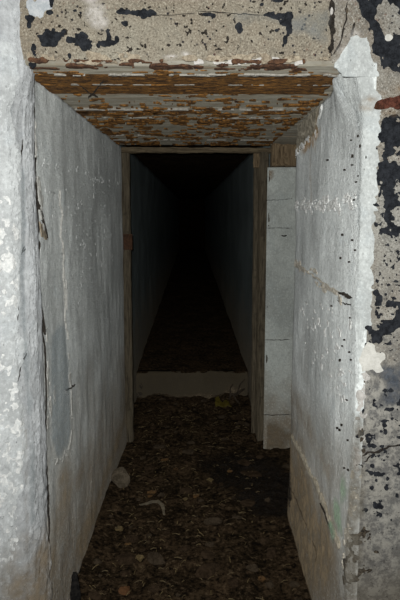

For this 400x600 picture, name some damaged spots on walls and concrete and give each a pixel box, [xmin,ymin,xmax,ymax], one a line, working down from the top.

peeling [21,0,175,68]
spalling [162,0,305,65]
corrosion [30,63,334,146]
corrosion [374,95,400,110]
crack [21,106,69,339]
crack [294,259,352,306]
peeling [316,0,400,491]
crack [42,309,50,543]
leakage [382,367,400,404]
spalling [341,488,384,585]